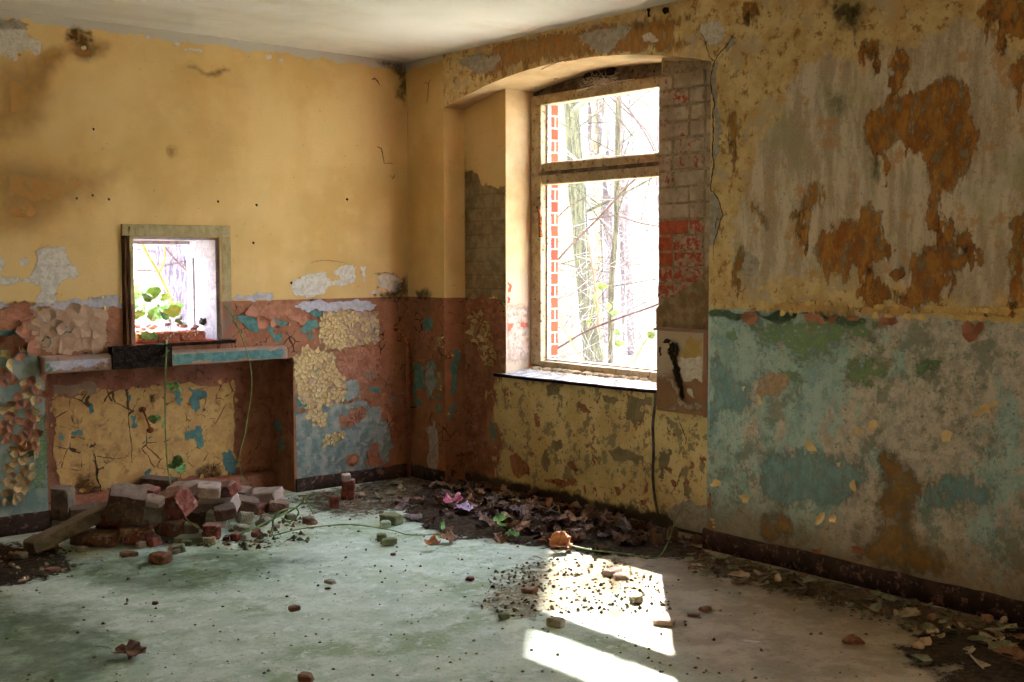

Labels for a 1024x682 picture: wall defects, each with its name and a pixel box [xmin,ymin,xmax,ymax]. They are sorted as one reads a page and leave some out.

leakage [3,28,102,118]
flaking render [575,23,659,54]
crack [701,33,736,254]
flaking render [656,20,736,398]
flaking render [412,170,529,477]
peeling [740,299,1024,343]
crack [92,409,132,491]
peeling [0,245,403,517]
peeling [510,440,578,488]
peeling [602,393,652,425]
spalling [640,449,721,533]
leakage [857,448,945,575]